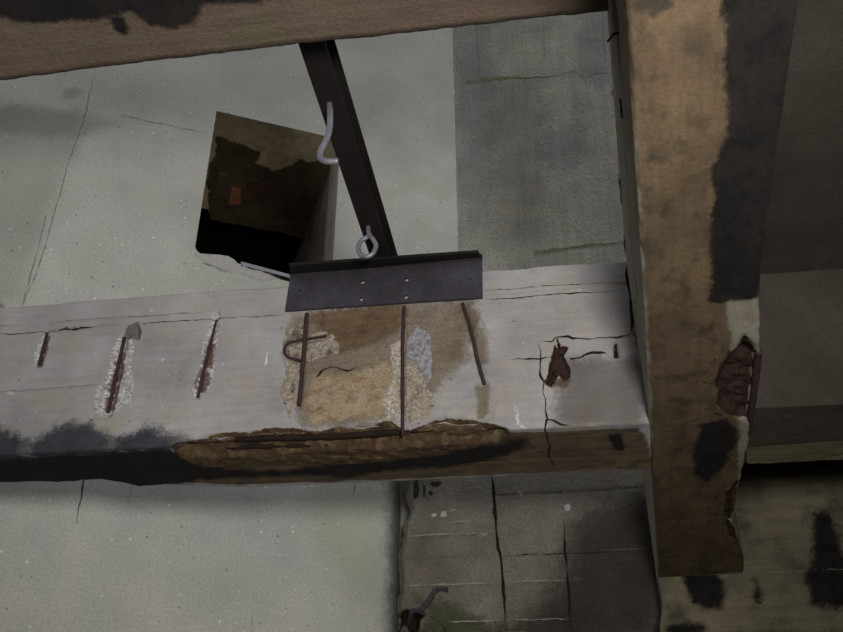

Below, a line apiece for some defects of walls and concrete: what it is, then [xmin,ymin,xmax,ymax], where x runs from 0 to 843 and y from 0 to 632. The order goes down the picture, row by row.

crack [22,73,95,307]
rust [105,353,125,412]
spalling [92,322,142,418]
crack [0,311,273,335]
rust [196,344,215,393]
spalling [171,302,507,468]
rust [286,301,488,426]
crack [478,221,637,467]
spalling [545,345,571,387]
water stain [0,420,183,462]
crack [491,476,580,632]
spalling [399,586,449,632]